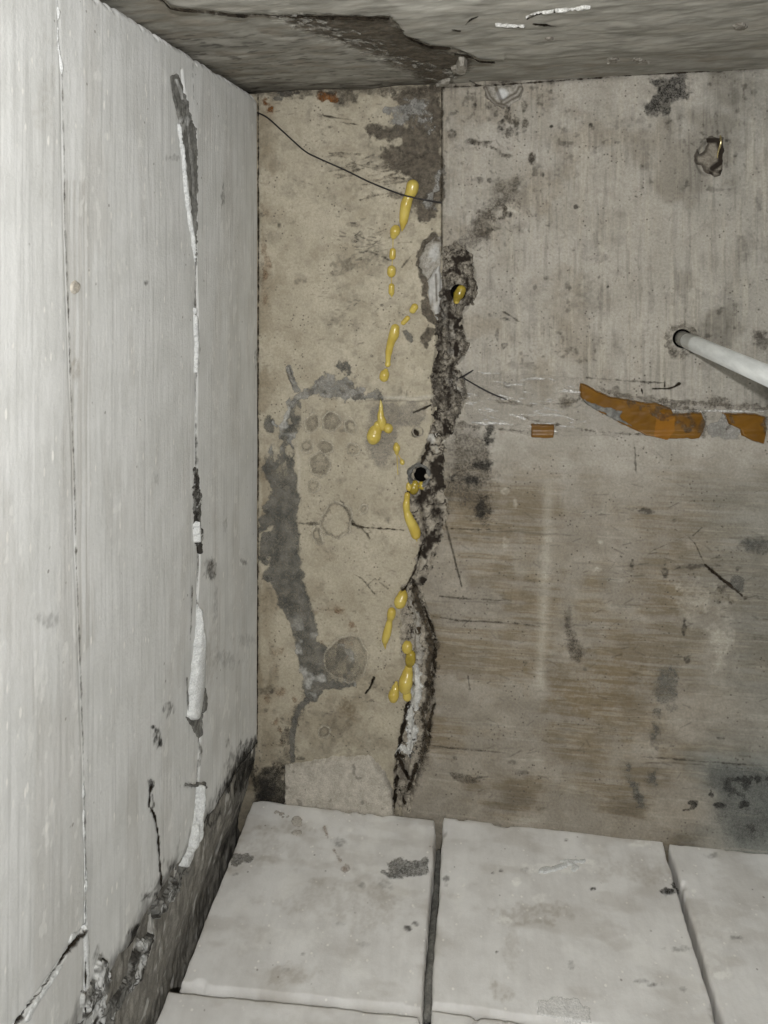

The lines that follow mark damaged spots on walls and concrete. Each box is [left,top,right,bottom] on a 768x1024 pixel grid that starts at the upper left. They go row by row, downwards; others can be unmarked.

leakage [276,13,471,222]
peeling [436,56,467,87]
crack [191,262,204,613]
crack [343,234,528,814]
crack [143,779,163,900]
spalling [147,863,192,919]
crack [14,902,87,1024]
spalling [78,932,154,1024]